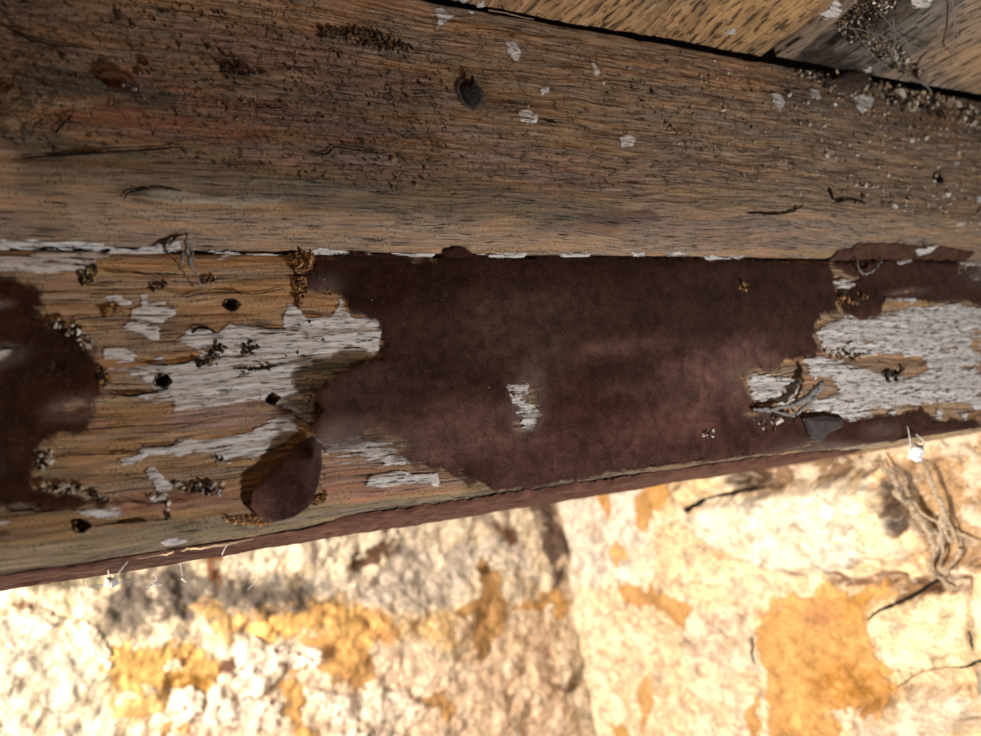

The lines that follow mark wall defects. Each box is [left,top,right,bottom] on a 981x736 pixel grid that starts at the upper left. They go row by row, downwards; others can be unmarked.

peeling [0,239,181,276]
peeling [305,247,374,257]
peeling [893,245,938,265]
peeling [103,294,440,492]
peeling [747,298,981,443]
peeling [77,508,124,519]
spalling [618,582,694,629]
crack [867,575,945,621]
crack [748,637,756,665]
spalling [745,577,901,736]
crack [898,631,981,687]
spalling [634,676,654,734]